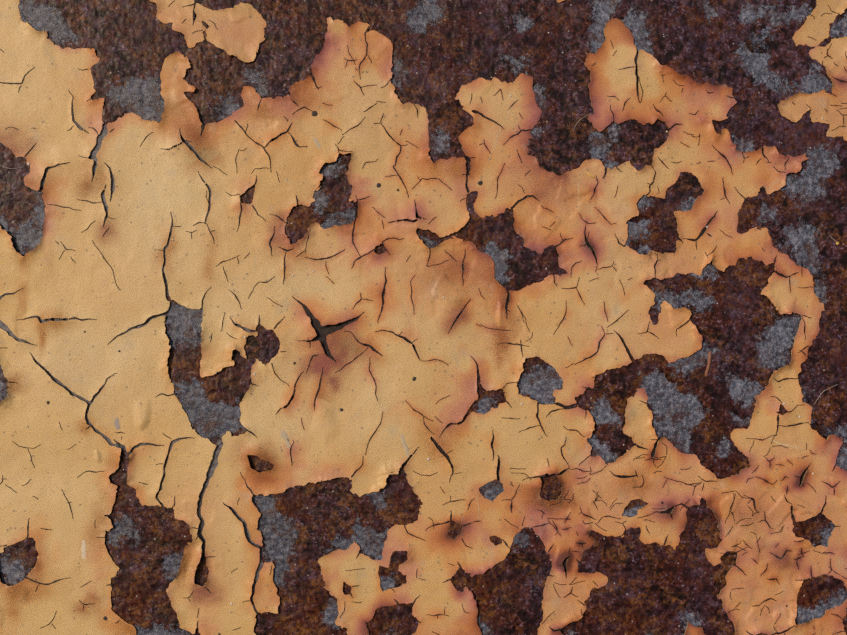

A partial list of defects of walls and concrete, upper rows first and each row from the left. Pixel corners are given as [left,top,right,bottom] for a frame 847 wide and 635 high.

peeling [0,142,46,256]
crack [39,90,120,290]
crack [107,26,692,478]
peeling [18,0,847,479]
crack [608,40,789,258]
peeling [104,449,200,635]
crack [192,440,223,558]
peeling [252,464,423,635]
crack [390,395,481,635]
peeling [450,527,552,635]
peeling [561,498,737,635]
crack [491,377,847,635]